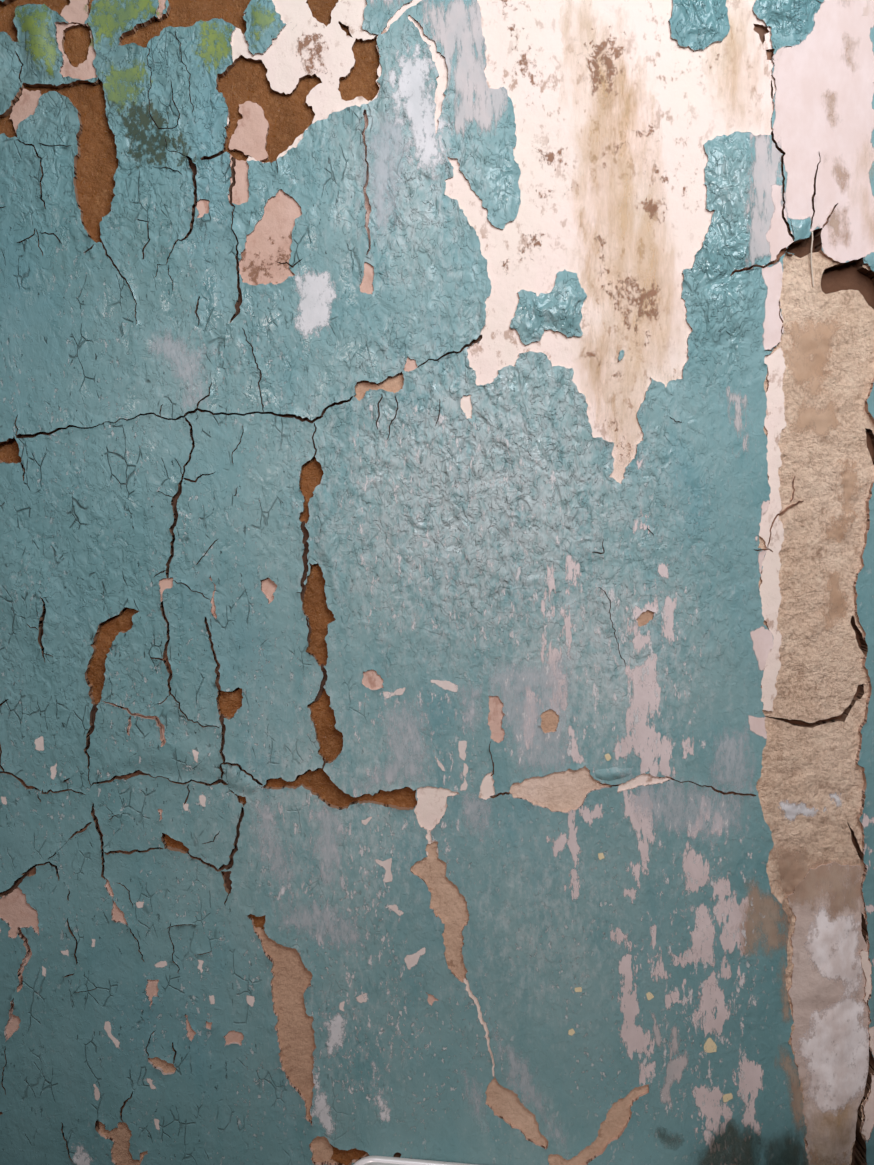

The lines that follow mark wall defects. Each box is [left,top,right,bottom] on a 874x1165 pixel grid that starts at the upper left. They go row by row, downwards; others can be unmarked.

crack [381,0,448,133]
peeling [196,199,210,218]
crack [417,335,482,368]
crack [0,31,399,993]
peeling [229,0,874,1165]
crack [598,587,626,666]
crack [489,742,510,798]
crack [659,776,756,796]